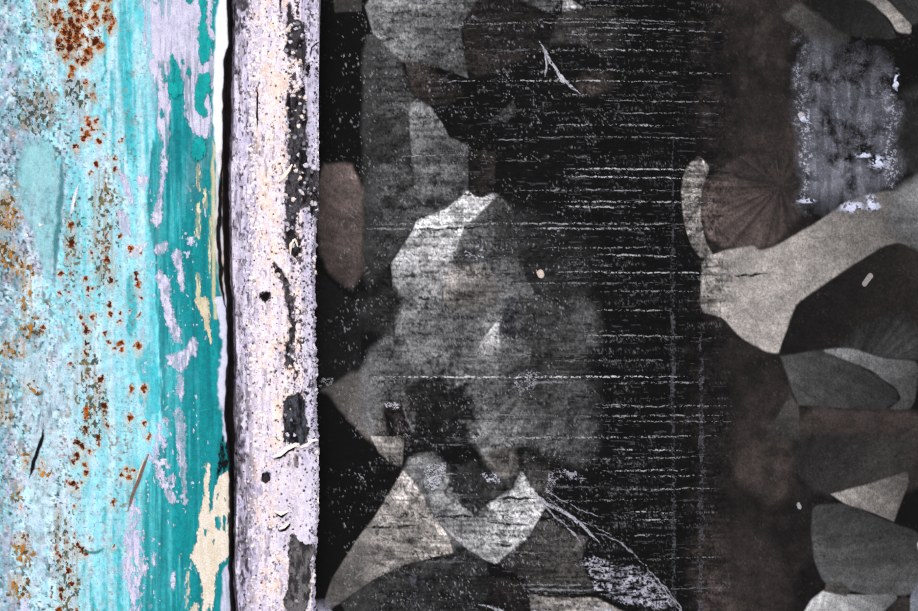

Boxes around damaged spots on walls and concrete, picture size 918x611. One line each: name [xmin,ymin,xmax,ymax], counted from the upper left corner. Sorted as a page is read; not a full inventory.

rust [0,196,21,230]
rust [17,91,56,135]
rust [38,0,116,153]
peeling [139,0,215,273]
spalling [278,87,319,286]
rust [0,240,46,360]
rust [48,155,143,611]
peeling [117,170,198,504]
spalling [272,300,319,511]
rust [6,532,37,605]
peeling [170,463,235,611]
spalling [273,510,317,611]